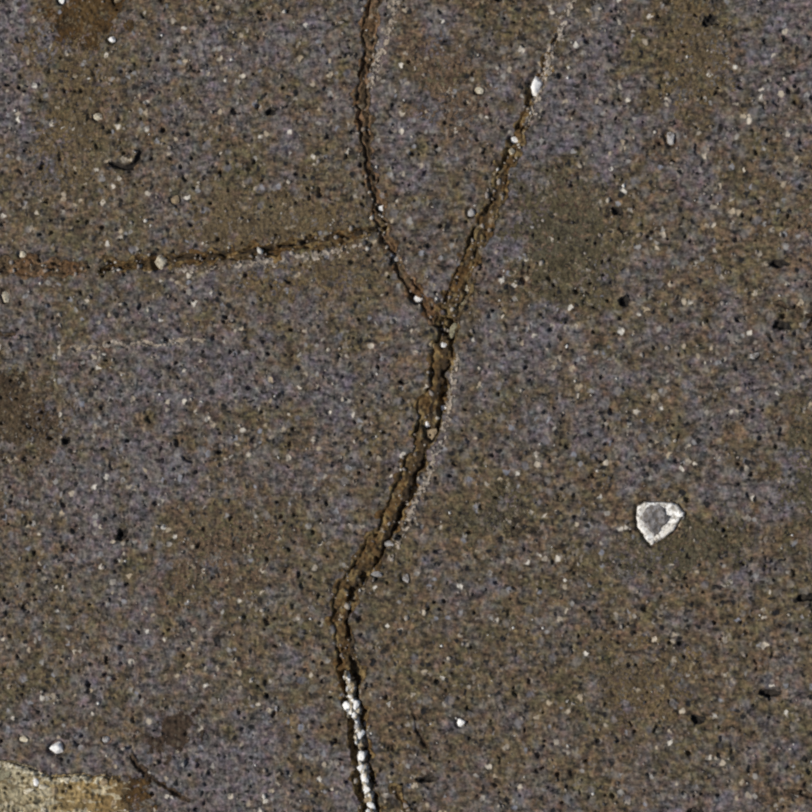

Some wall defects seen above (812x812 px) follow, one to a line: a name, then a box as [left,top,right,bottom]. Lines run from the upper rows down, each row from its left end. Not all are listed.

spalling [0,761,158,812]
crack [0,0,576,812]